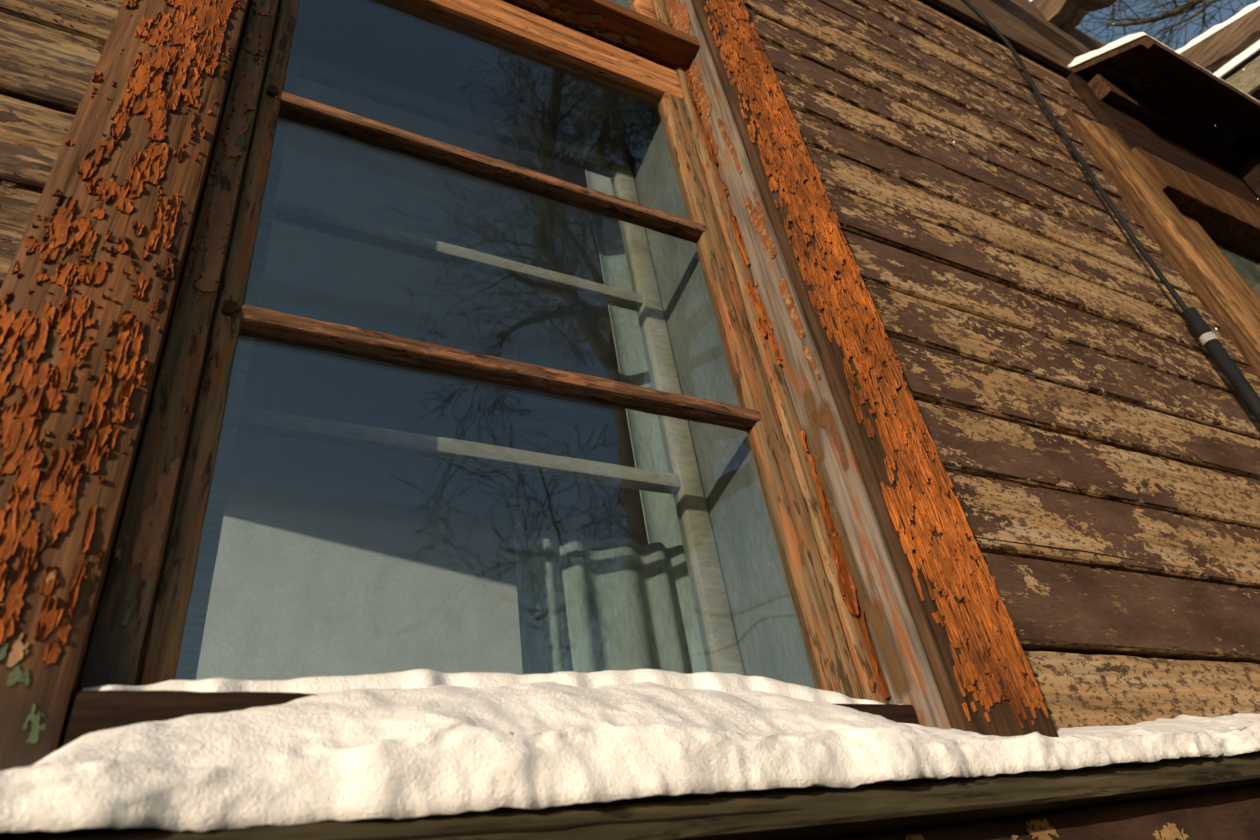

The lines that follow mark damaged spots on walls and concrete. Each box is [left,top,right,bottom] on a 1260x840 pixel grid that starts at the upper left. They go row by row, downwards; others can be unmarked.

peeling [664,0,691,34]
peeling [683,58,742,174]
peeling [728,190,777,265]
peeling [0,0,278,688]
peeling [743,0,1260,699]
peeling [1011,818,1059,840]
peeling [1153,822,1188,840]